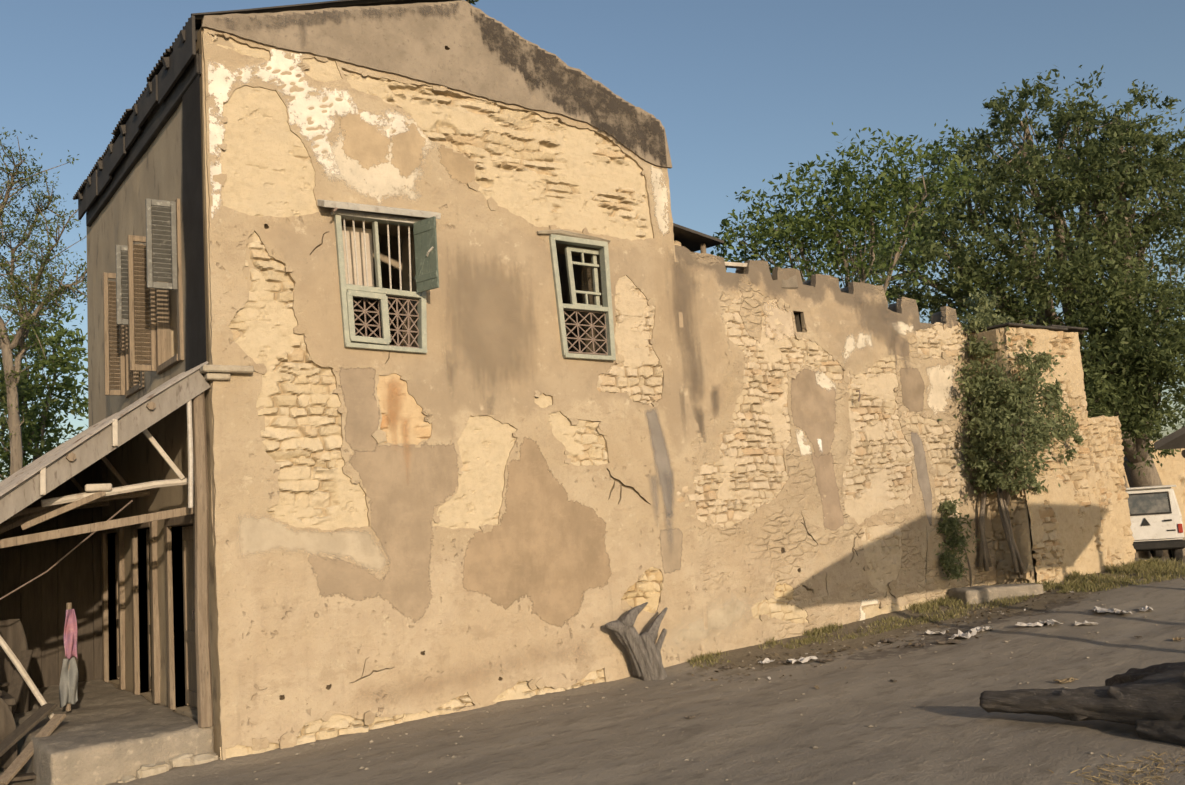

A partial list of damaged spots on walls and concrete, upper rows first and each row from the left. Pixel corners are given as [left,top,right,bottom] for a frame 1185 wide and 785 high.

damp [250,8,406,29]
damp [473,13,667,168]
spalling [208,30,669,533]
damp [646,410,672,517]
spalling [676,292,968,624]
spalling [620,567,663,613]
spalling [220,692,473,760]
spalling [493,669,605,703]